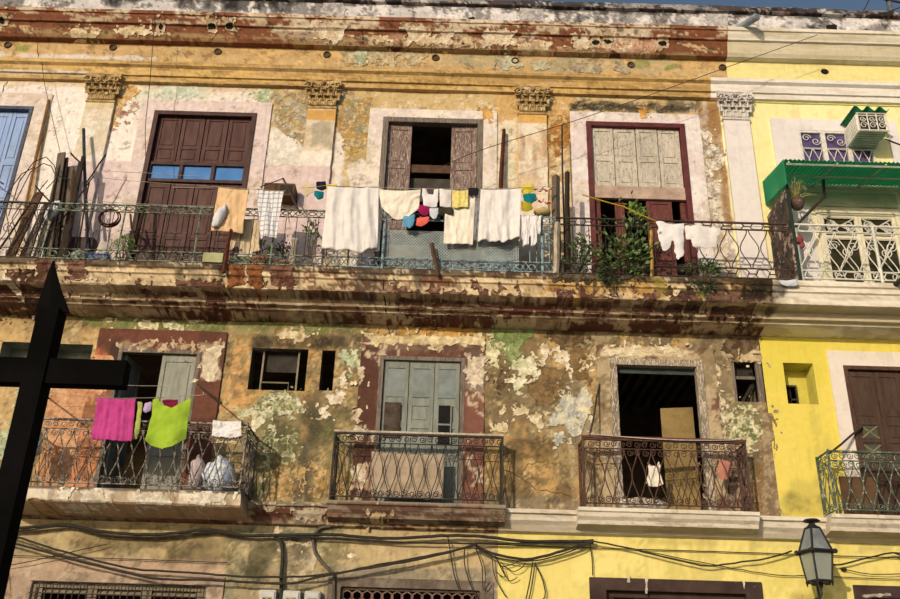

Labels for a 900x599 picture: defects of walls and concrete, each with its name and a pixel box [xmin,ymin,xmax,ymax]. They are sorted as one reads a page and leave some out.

peeling [63,11,171,44]
peeling [307,2,670,75]
peeling [110,84,141,133]
peeling [157,85,202,100]
peeling [702,128,727,227]
peeling [91,273,236,384]
flaking render [232,273,783,531]
peeling [0,419,12,460]
peeling [28,388,120,521]
peeling [134,489,172,515]
peeling [188,491,238,520]
peeling [255,525,323,587]